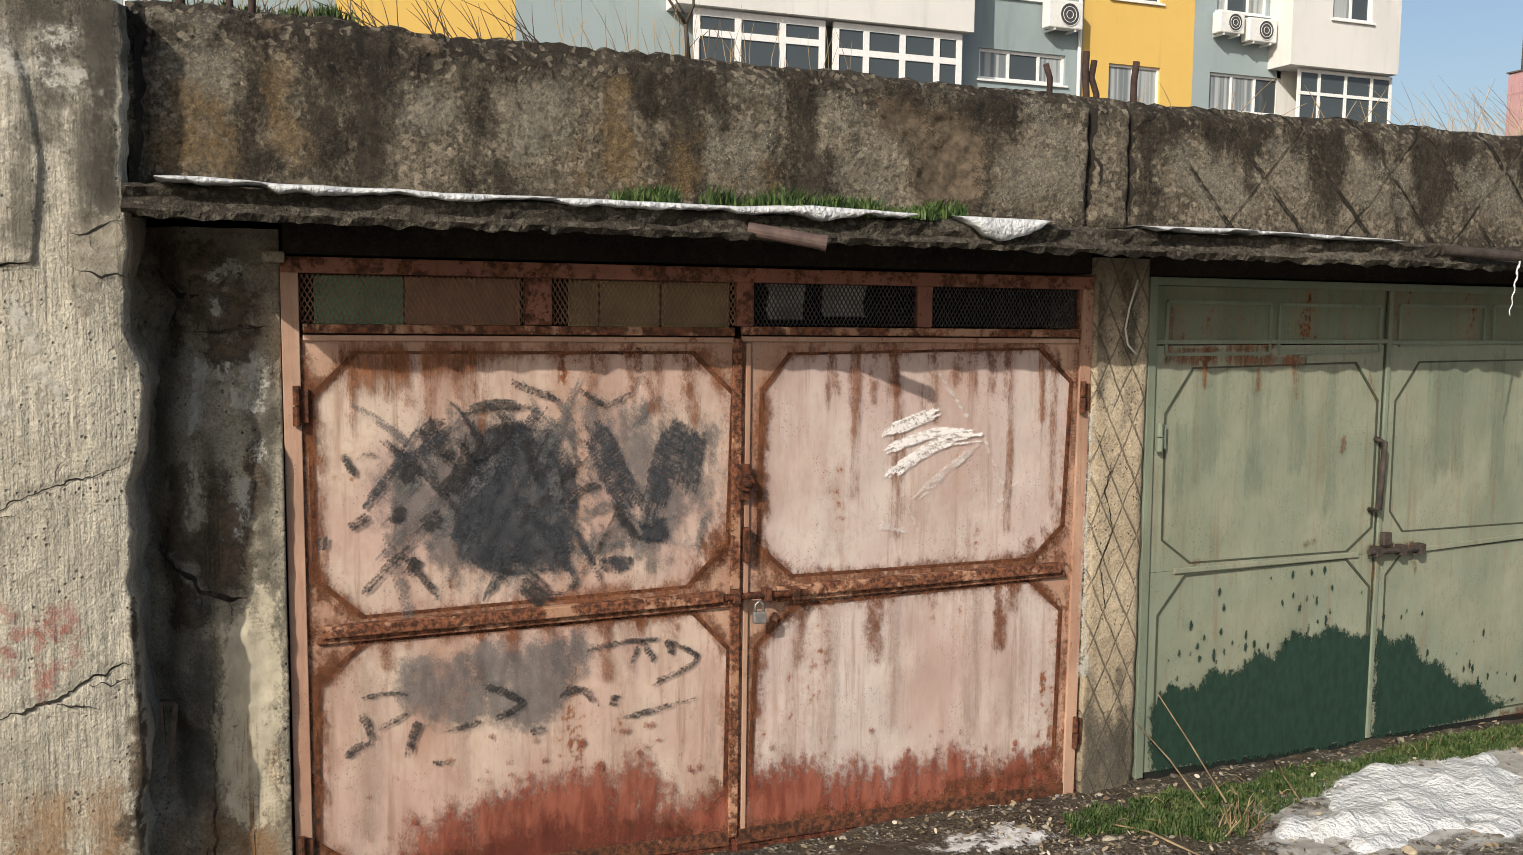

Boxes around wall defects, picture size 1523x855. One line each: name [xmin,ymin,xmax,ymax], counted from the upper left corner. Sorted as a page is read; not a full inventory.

crack [1084,99,1160,216]
damp [1129,108,1482,233]
corrosion [1165,307,1307,389]
crack [0,460,130,518]
damp [252,384,276,588]
crack [161,550,255,626]
corrosion [300,339,603,814]
corrosion [474,342,1079,813]
crack [0,662,135,720]